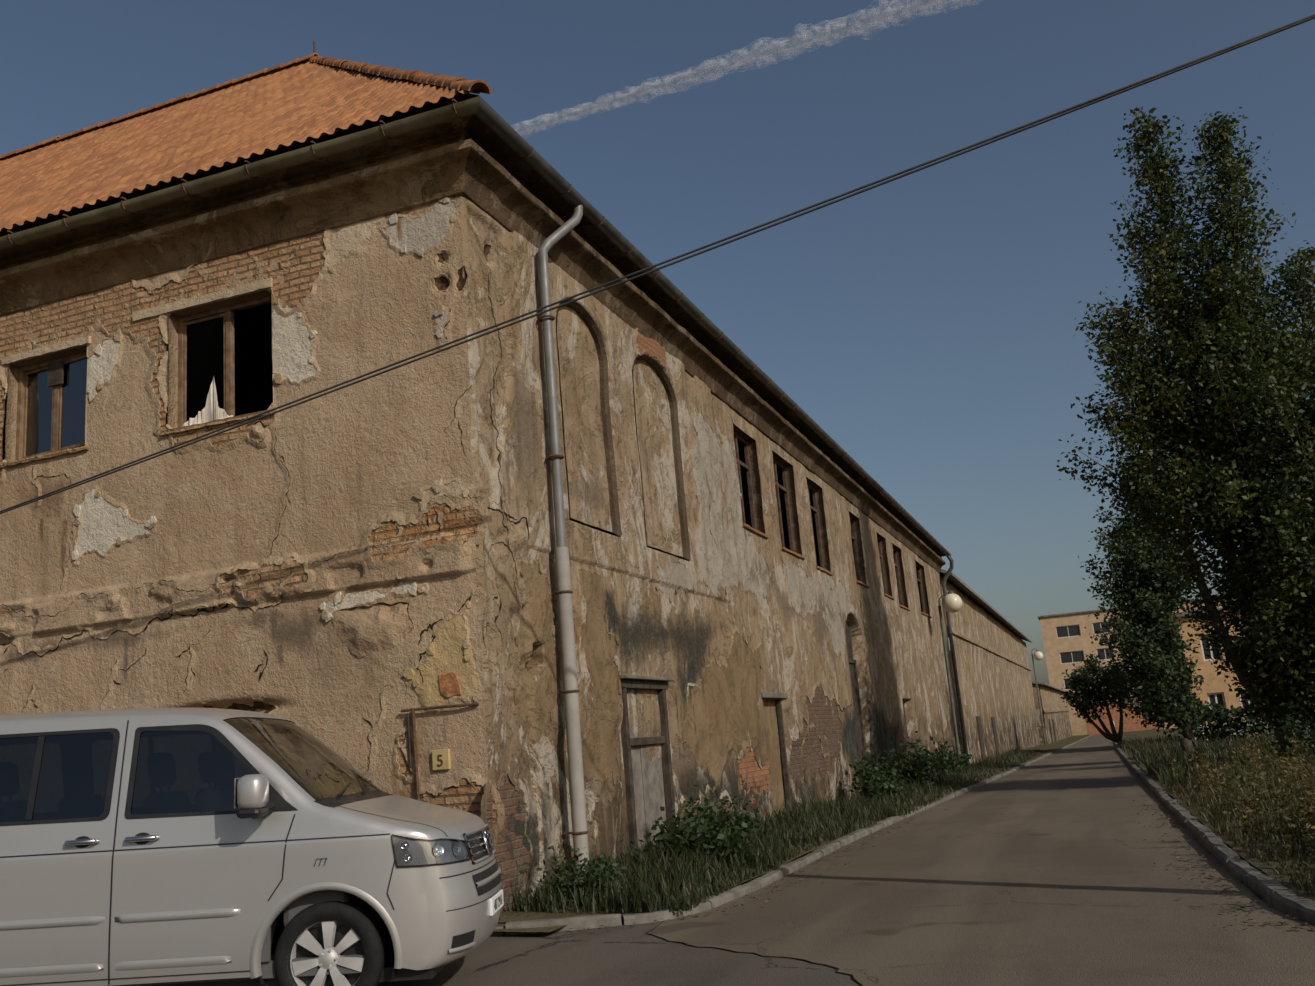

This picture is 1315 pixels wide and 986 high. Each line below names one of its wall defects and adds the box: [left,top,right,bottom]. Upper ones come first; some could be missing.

flaking render [0,196,470,485]
peeling [71,485,157,567]
crack [0,265,520,778]
flaking render [214,476,493,623]
peeling [403,583,484,713]
damp [606,593,711,716]
flaking render [391,725,533,914]